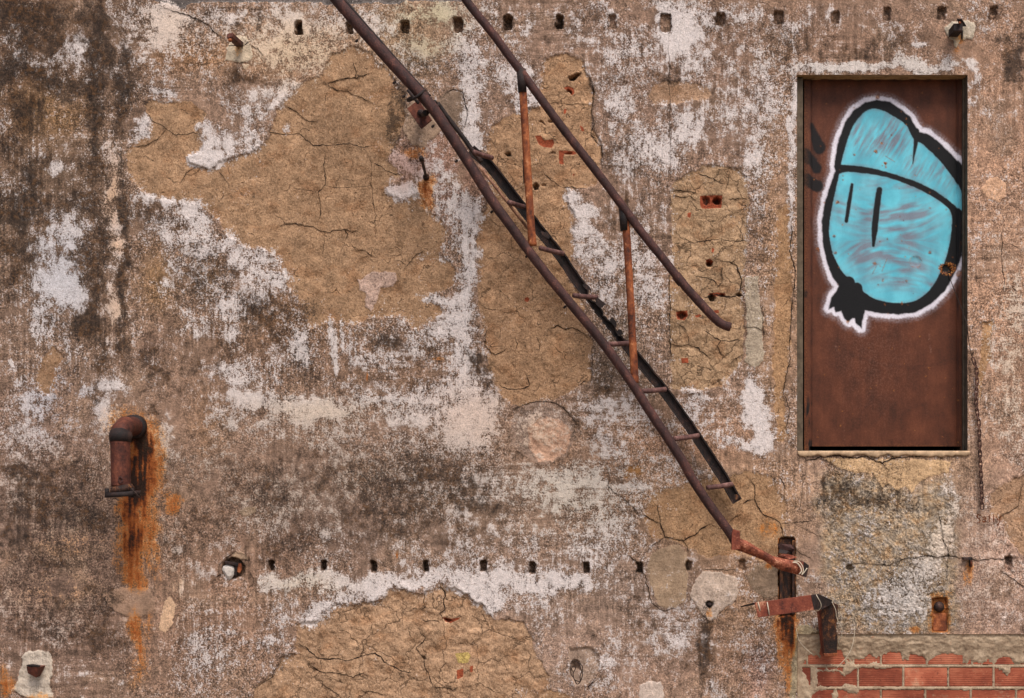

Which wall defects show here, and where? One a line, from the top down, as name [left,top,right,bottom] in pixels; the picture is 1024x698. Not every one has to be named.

leakage [0,0,134,404]
peeling [97,377,126,394]
spalling [103,1,603,457]
spalling [642,51,985,562]
rust [92,399,188,698]
spalling [247,559,594,698]
rust [766,612,803,698]
crack [845,513,1024,587]